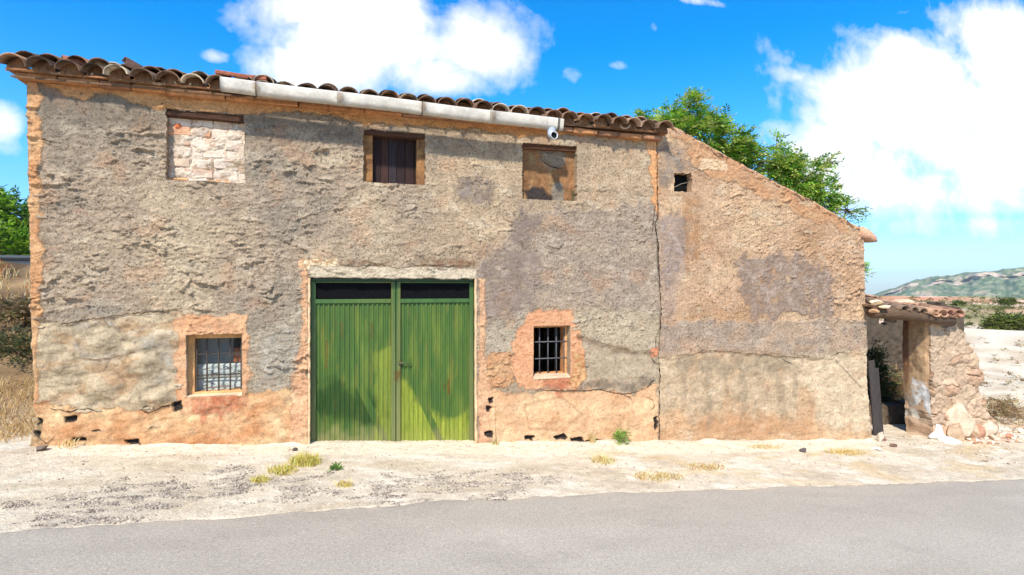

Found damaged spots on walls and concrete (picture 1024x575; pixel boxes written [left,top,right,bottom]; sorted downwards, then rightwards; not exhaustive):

peeling [26,82,596,447]
peeling [477,279,660,443]
crack [535,142,864,440]